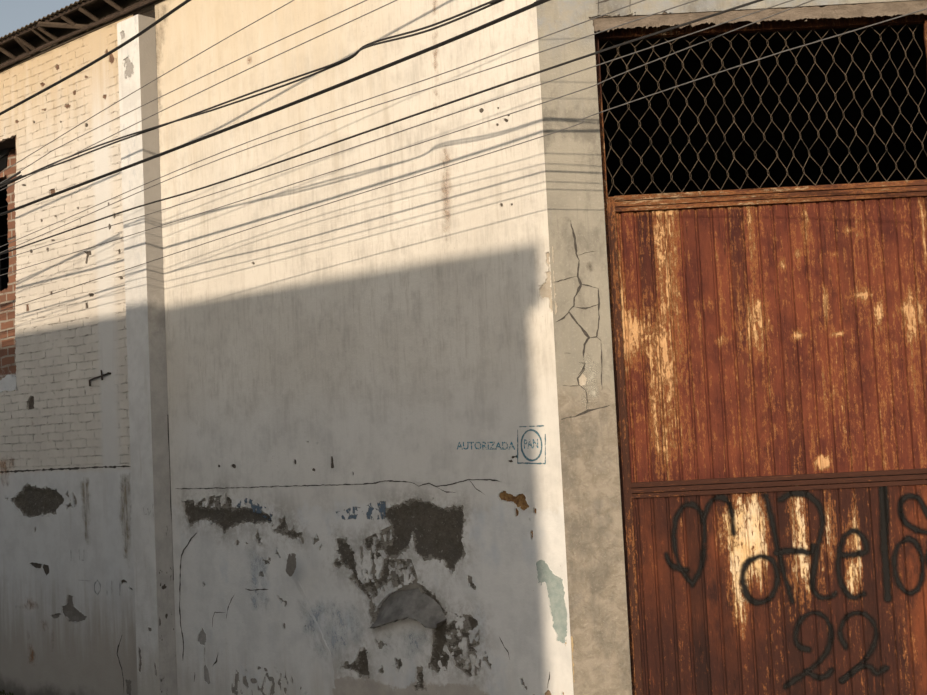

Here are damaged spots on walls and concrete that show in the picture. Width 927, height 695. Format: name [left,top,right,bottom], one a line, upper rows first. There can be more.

flaking render [589,0,927,32]
crack [552,220,610,420]
crack [167,415,500,519]
flaking render [6,484,77,531]
flaking render [185,495,321,548]
peeling [260,551,296,577]
flaking render [51,595,87,622]
crack [172,533,218,680]
crack [212,589,269,627]
flaking render [334,498,492,691]
peeling [231,666,302,695]